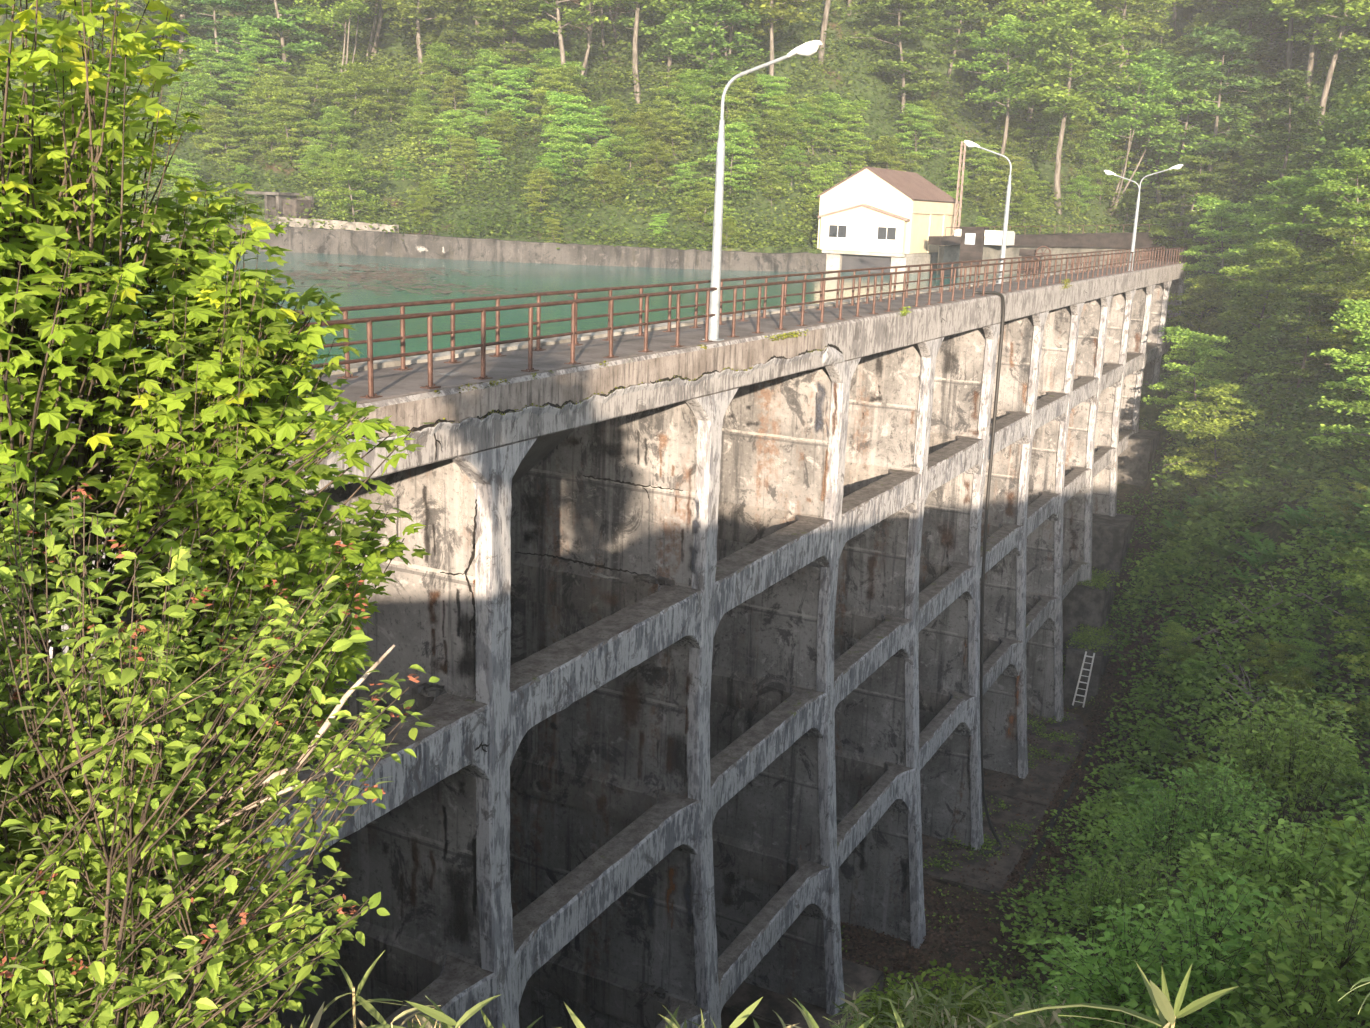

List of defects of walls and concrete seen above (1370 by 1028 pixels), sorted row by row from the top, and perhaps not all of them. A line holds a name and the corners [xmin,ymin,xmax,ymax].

leakage [592,431,647,466]
corrosion [428,591,447,673]
crack [440,499,477,672]
leakage [442,806,477,942]